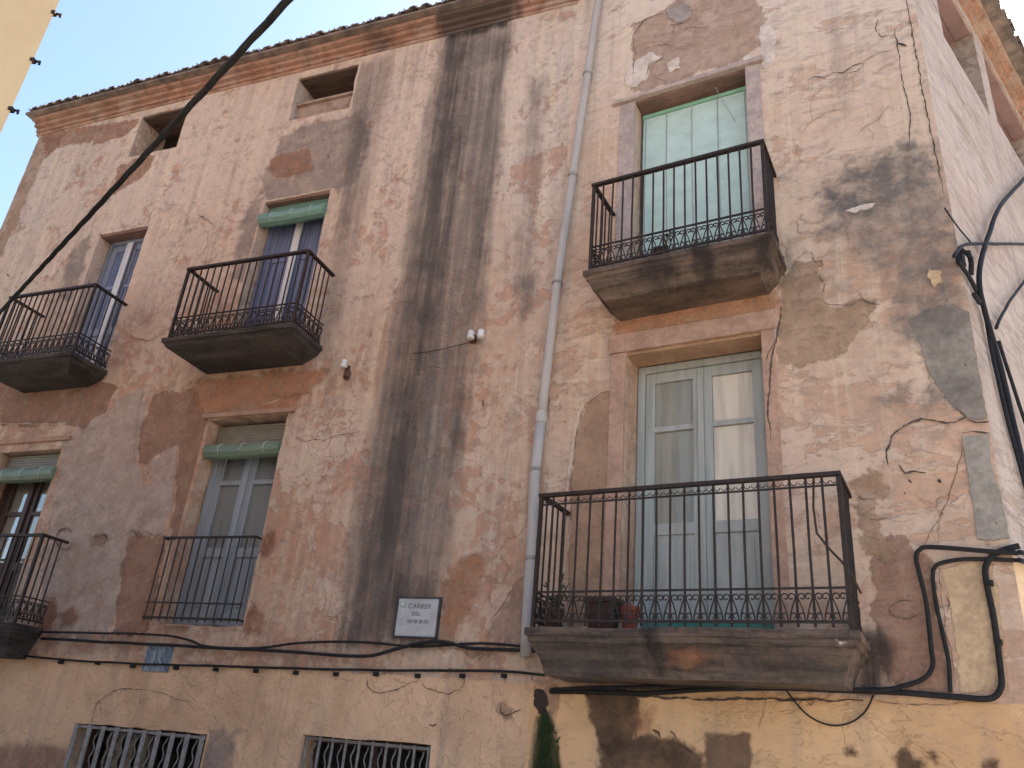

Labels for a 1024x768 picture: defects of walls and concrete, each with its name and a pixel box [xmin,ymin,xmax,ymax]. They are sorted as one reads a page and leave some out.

flaking render [625,0,777,88]
crack [803,0,944,193]
leakage [829,165,899,260]
leakage [348,21,507,641]
flaking render [613,257,880,368]
crack [766,307,781,439]
leakage [902,231,947,317]
flaking render [0,380,212,639]
crack [924,431,988,545]
flaking render [850,469,1009,706]
leakage [585,689,703,768]